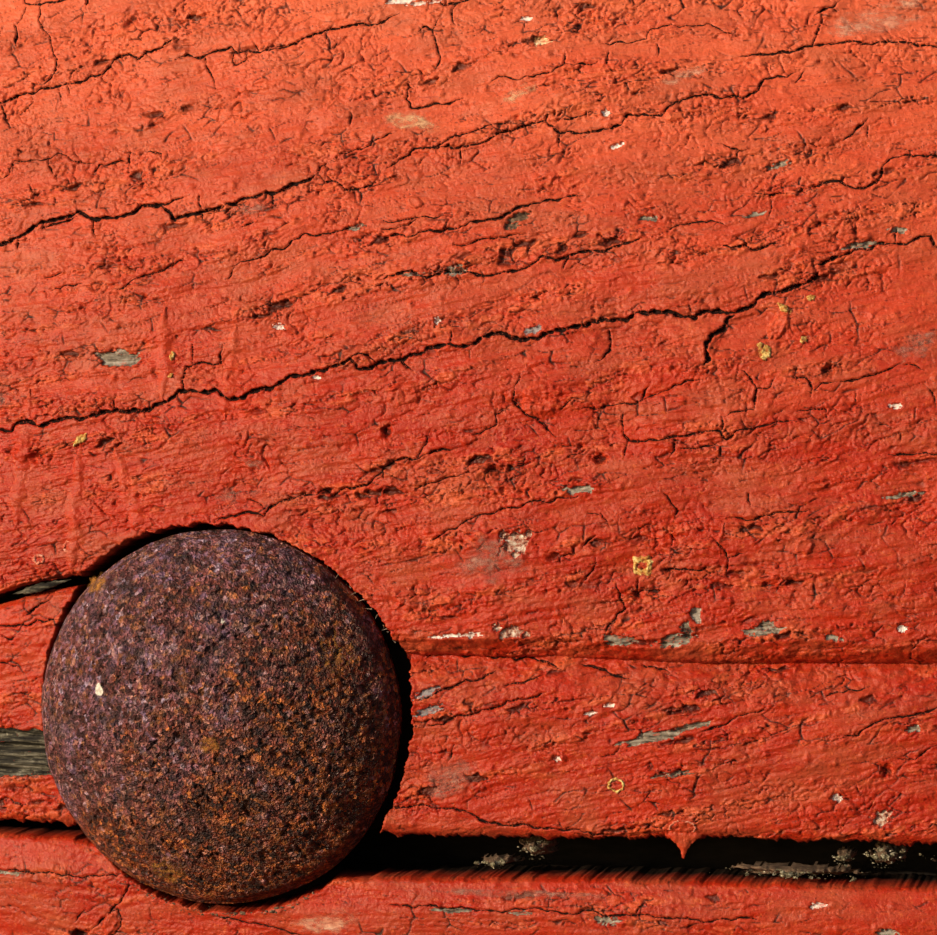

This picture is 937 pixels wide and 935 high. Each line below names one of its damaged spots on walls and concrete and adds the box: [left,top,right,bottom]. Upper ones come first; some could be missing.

crack [0,0,937,251]
crack [228,194,584,279]
peeling [94,349,141,367]
crack [0,231,937,522]
peeling [498,529,532,559]
crack [430,496,607,583]
crack [661,489,743,571]
corrosion [88,577,105,592]
peeling [602,608,701,648]
peeling [741,620,787,637]
peeling [614,721,711,747]
crack [844,707,937,737]